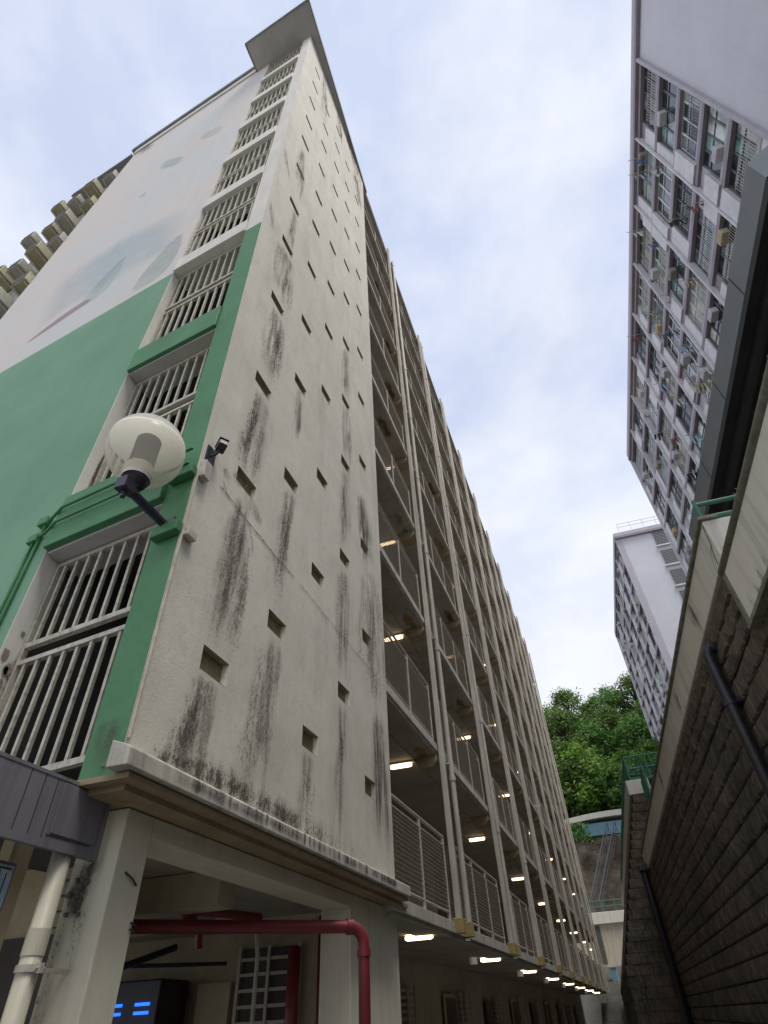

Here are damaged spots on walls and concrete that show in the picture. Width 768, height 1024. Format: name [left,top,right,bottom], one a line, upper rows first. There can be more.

damp [218,502,246,611]
damp [180,683,396,884]